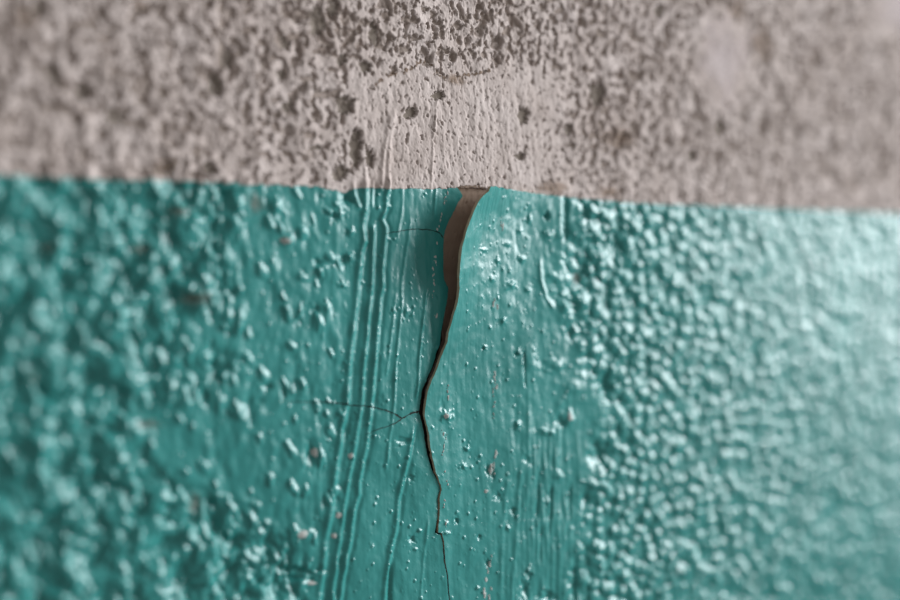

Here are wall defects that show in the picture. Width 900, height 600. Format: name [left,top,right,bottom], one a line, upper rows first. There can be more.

crack [286,325,443,489]
crack [435,521,450,600]